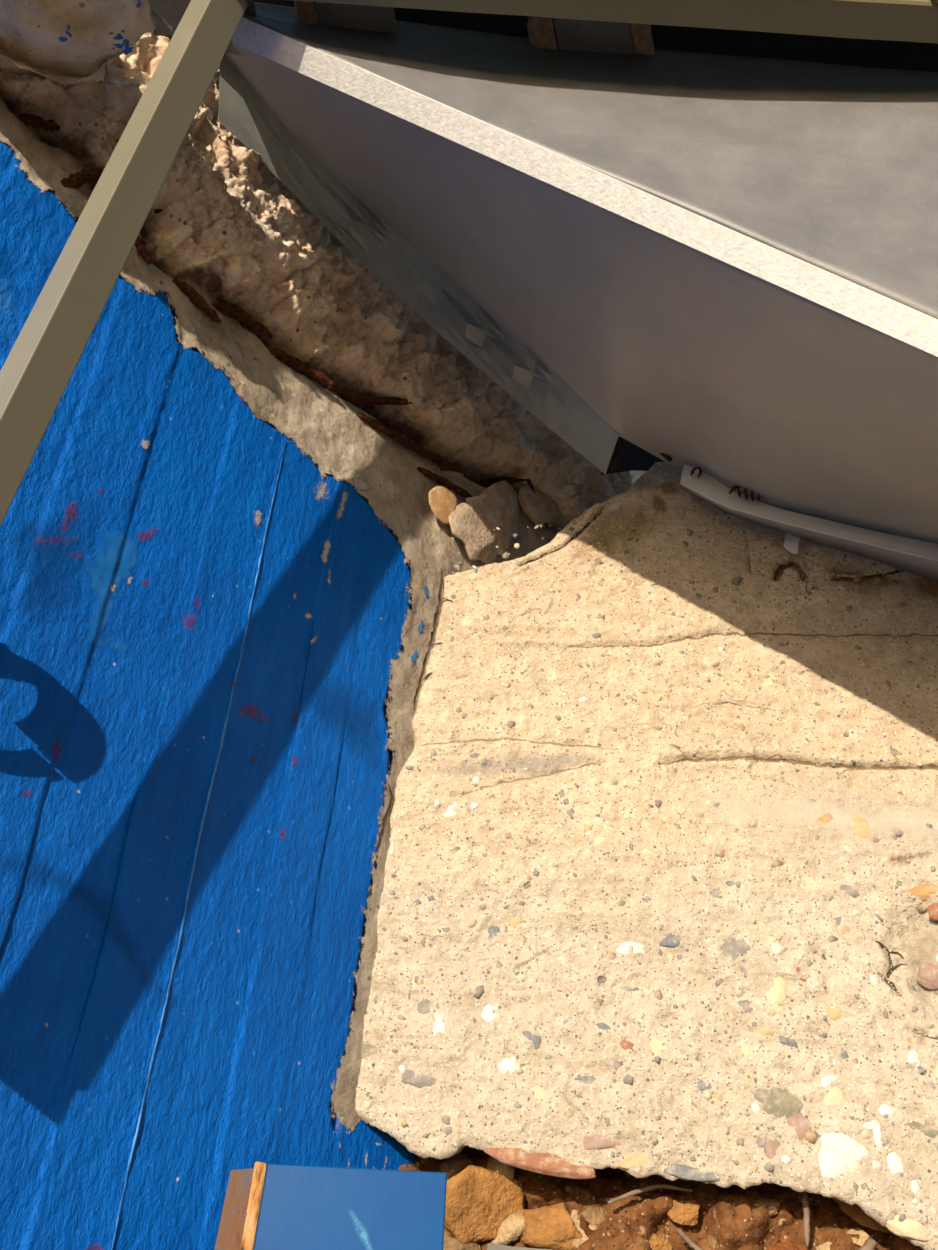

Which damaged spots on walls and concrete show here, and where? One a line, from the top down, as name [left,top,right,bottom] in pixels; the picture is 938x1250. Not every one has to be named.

spalling [0,31,170,219]
crack [412,567,452,715]
spalling [120,65,868,1133]
crack [570,632,938,648]
crack [421,737,608,796]
crack [659,744,938,776]
spalling [437,656,938,1241]